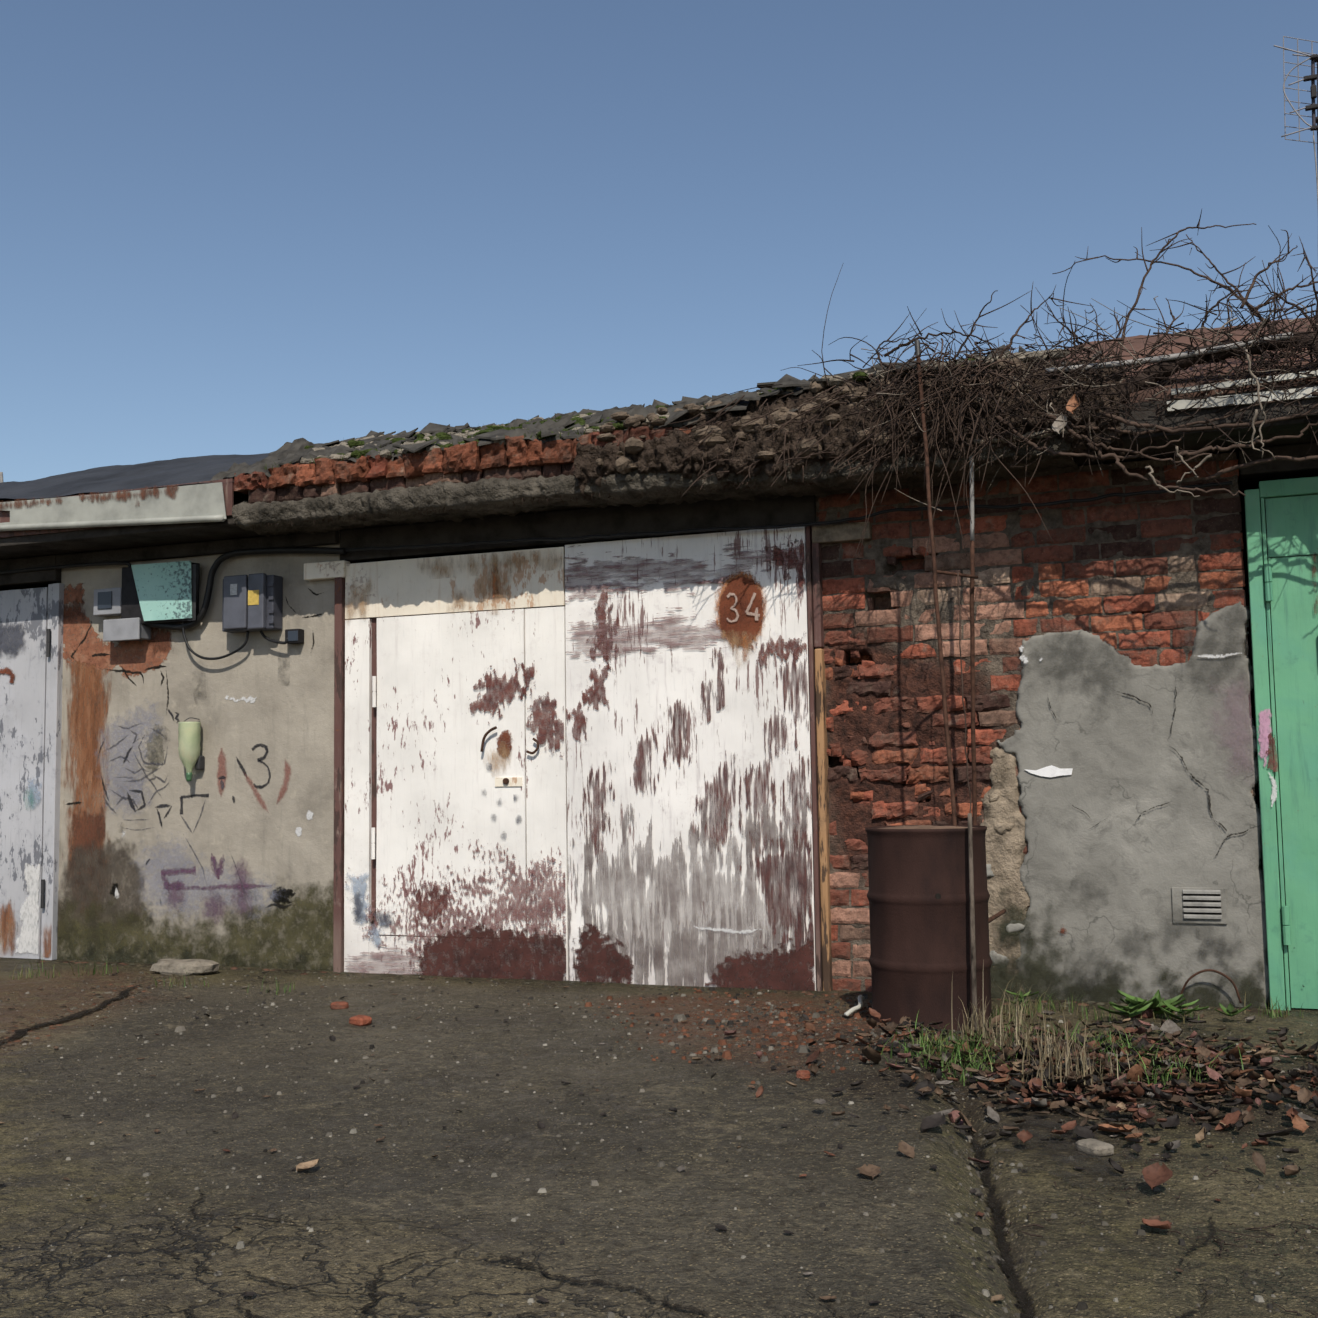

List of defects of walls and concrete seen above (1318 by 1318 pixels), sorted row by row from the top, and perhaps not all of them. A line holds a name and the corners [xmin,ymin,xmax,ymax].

corrosion [79,484,177,506]
corrosion [716,572,766,657]
spalling [835,650,875,678]
corrosion [66,660,109,872]
corrosion [492,730,512,768]
spalling [900,766,934,802]
crack [1117,677,1257,855]
water stain [57,842,334,971]